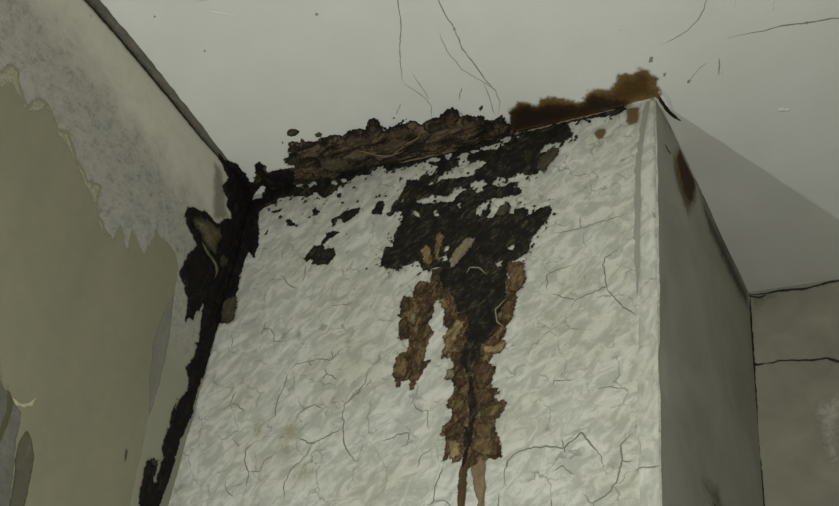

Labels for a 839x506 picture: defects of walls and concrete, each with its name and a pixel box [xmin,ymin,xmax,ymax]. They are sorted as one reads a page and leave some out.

flaking render [282,106,516,179]
crack [397,0,432,117]
crack [438,0,500,114]
rust [509,70,661,136]
crack [728,18,839,39]
peeling [0,0,231,506]
leakage [139,105,627,506]
crack [661,107,839,506]